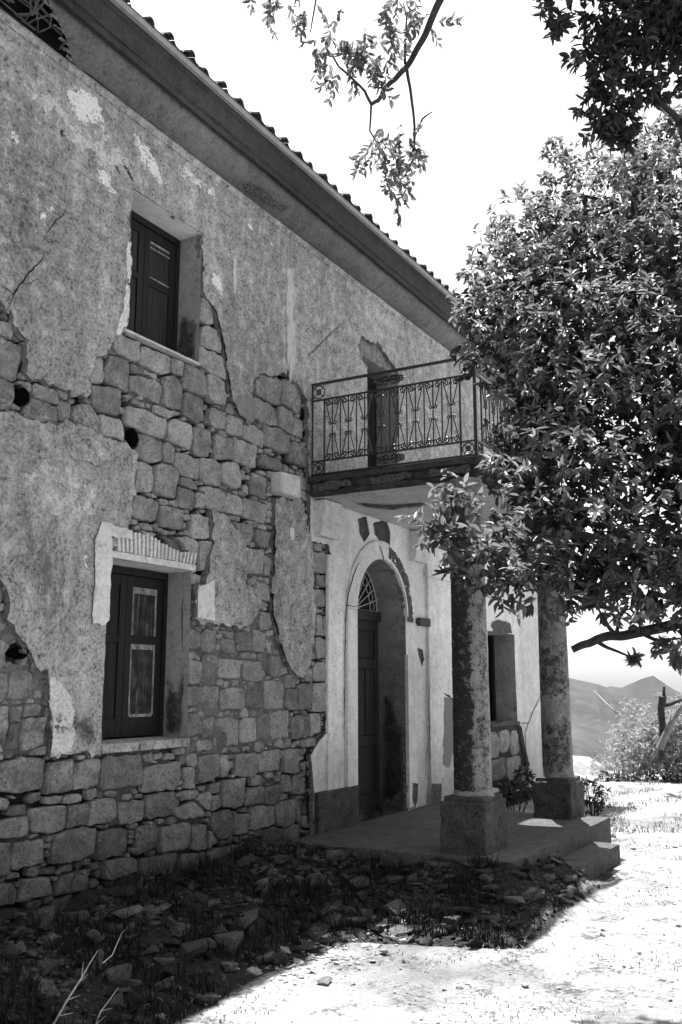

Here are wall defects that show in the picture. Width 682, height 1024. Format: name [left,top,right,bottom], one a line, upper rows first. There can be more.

crack [3,206,68,307]
water stain [166,679,183,733]
flaking render [0,241,352,914]
water stain [449,489,491,793]